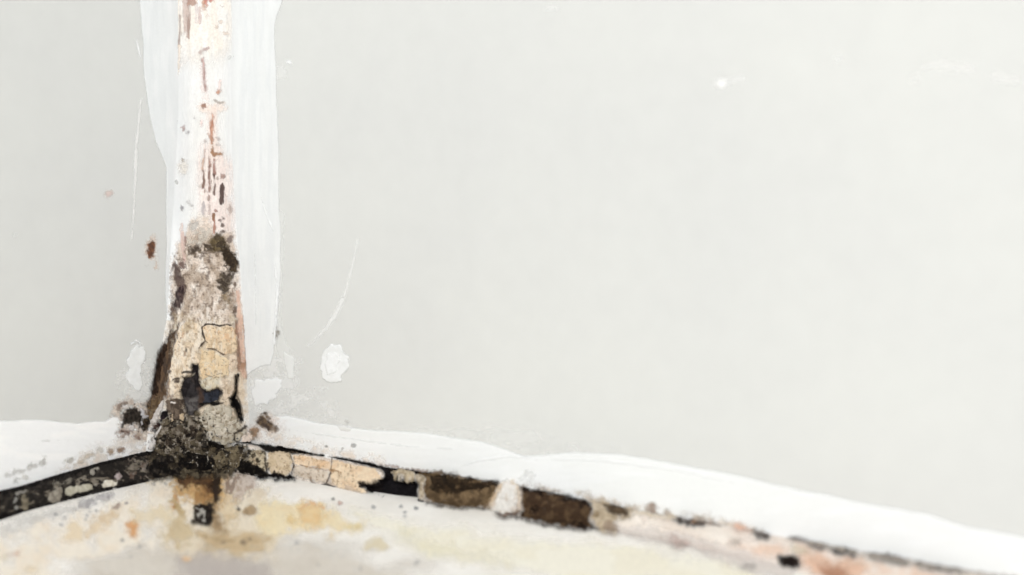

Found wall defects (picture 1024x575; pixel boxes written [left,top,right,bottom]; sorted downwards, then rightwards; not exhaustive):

corrosion [177,0,234,235]
corrosion [146,237,157,268]
leakage [144,201,244,411]
peeling [13,489,30,511]
peeling [48,467,122,504]
peeling [122,314,426,502]
crack [184,318,447,487]
leakage [0,412,801,575]
peeling [490,479,521,518]